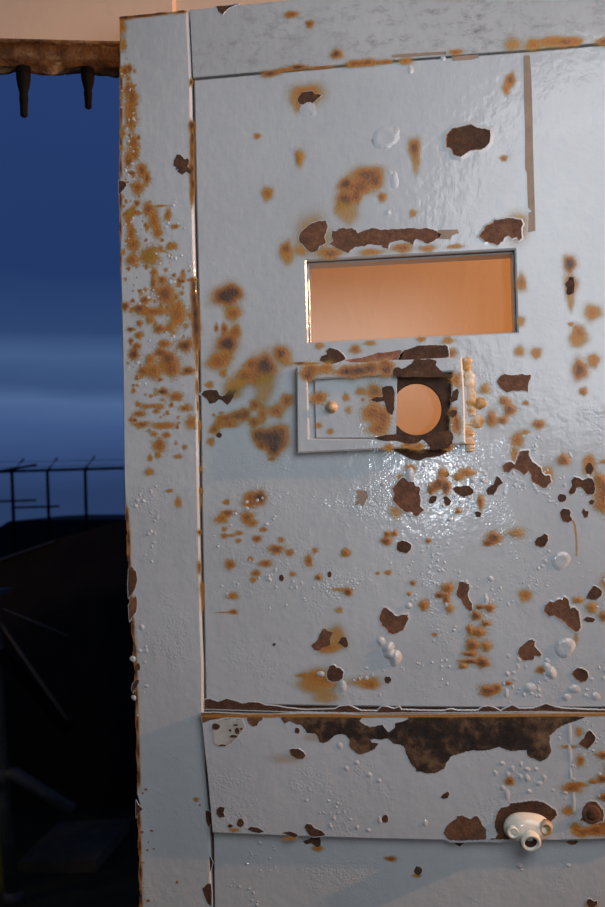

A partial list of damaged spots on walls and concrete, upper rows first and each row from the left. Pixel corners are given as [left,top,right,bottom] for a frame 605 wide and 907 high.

peeling [441,121,494,161]
peeling [476,55,535,247]
rust [119,10,434,475]
peeling [295,219,459,255]
peeling [319,344,456,415]
rust [450,407,461,435]
peeling [390,476,474,519]
peeling [200,698,605,775]
rust [562,728,585,766]
rust [562,775,605,801]
peeling [442,799,559,847]
rust [562,805,605,838]